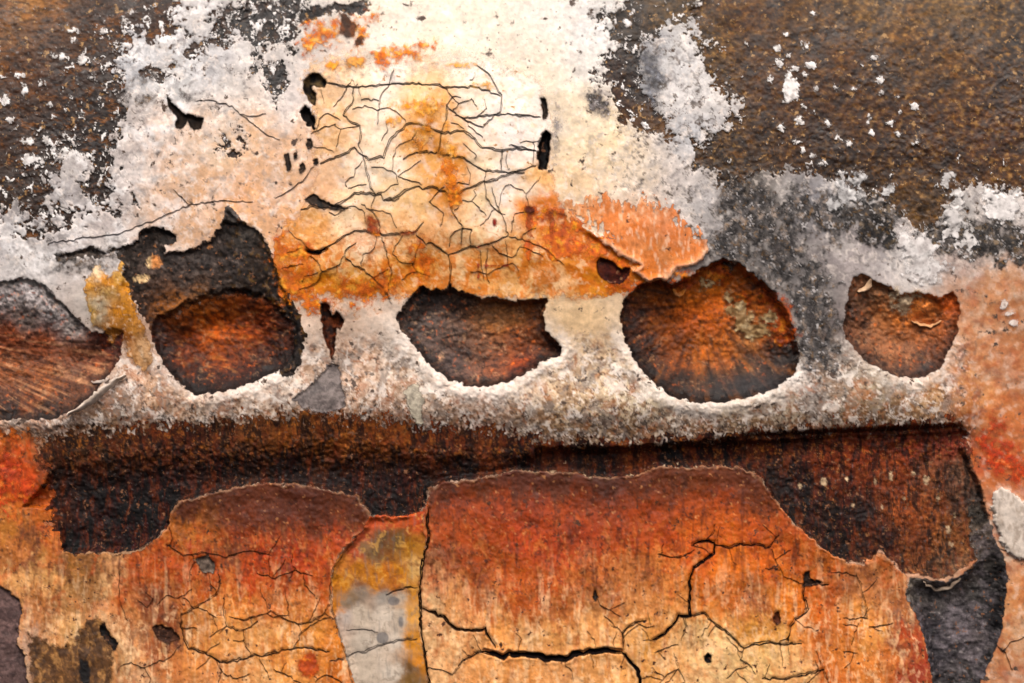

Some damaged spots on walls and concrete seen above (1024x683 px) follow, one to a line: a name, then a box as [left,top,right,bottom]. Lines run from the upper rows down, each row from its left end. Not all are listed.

water stain [641,49,666,106]
peeling [54,205,308,378]
crack [277,66,551,296]
peeling [564,191,708,298]
water stain [699,171,1024,389]
peeling [67,374,127,416]
crack [118,509,890,683]
peeling [0,426,1024,683]